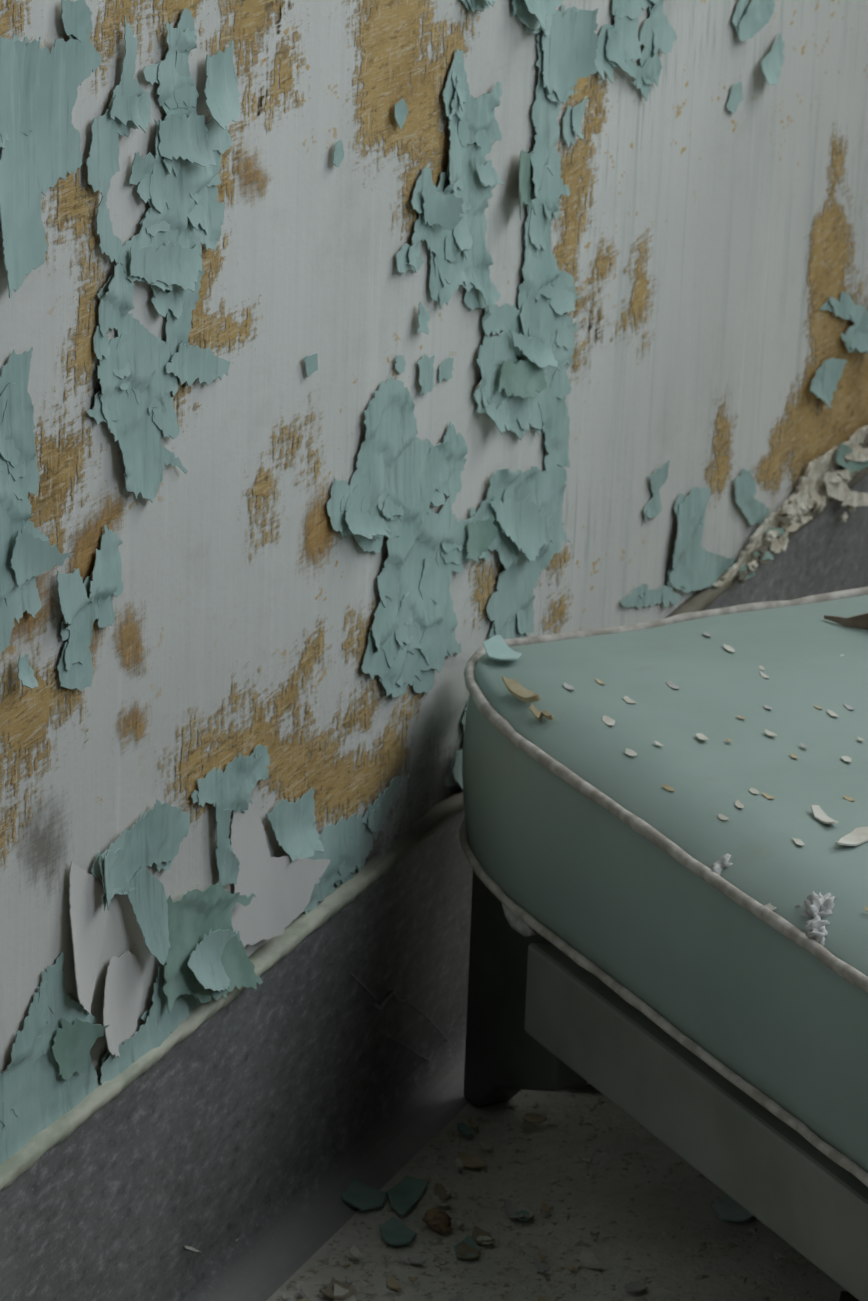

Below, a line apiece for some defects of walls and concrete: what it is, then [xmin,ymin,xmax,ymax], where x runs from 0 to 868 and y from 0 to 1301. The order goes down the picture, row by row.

peeling [732,0,785,85]
peeling [0,0,677,1164]
peeling [620,125,868,609]